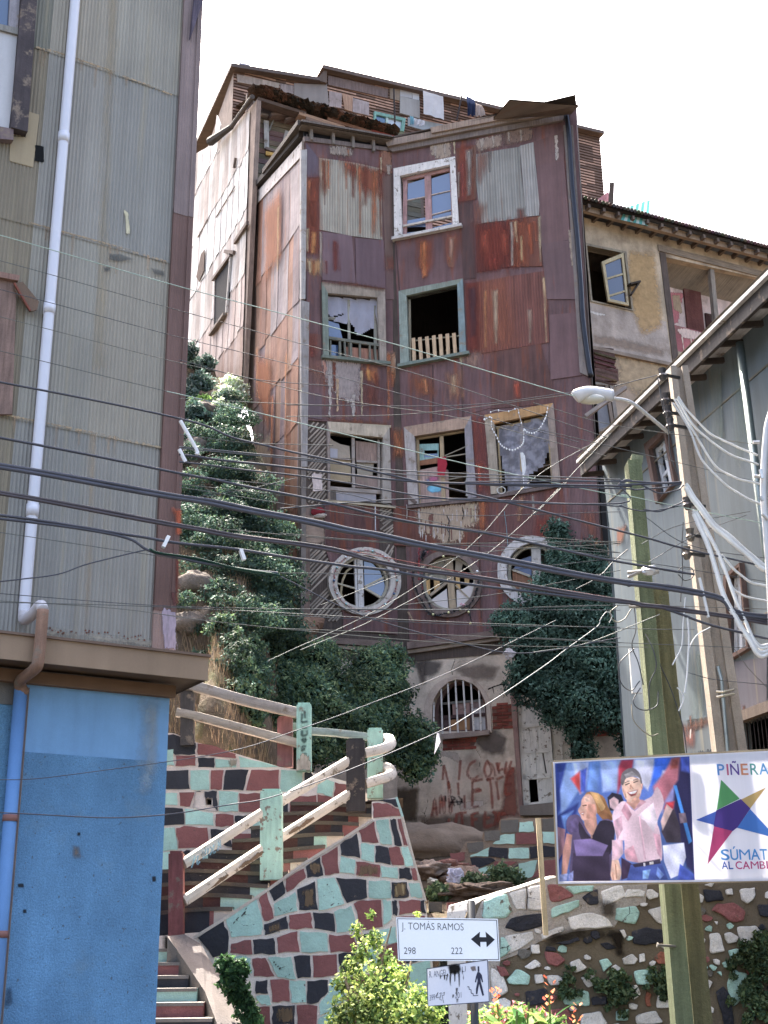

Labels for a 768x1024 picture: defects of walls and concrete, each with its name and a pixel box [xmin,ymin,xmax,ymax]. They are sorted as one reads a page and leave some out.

rust [345,161,382,234]
rust [265,192,280,275]
rust [420,240,429,276]
rust [478,207,541,269]
peeling [629,254,701,350]
peeling [322,359,363,417]
rust [332,354,403,455]
peeling [417,502,479,543]
leakage [476,730,506,754]
spalling [492,702,513,729]